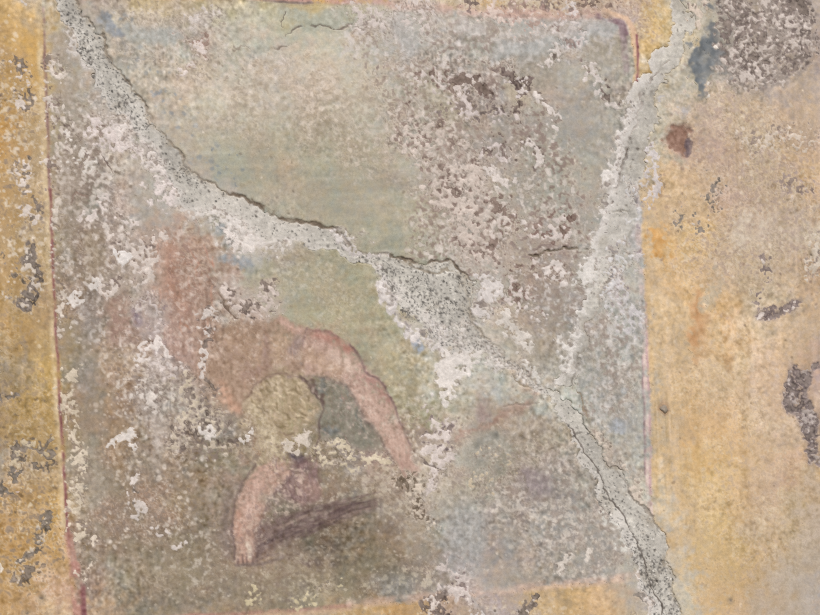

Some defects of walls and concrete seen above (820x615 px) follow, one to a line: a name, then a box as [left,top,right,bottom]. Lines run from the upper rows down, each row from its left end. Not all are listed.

peeling [0,19,305,462]
peeling [171,0,231,82]
crack [55,0,476,325]
peeling [279,0,820,548]
crack [617,0,696,212]
peeling [0,358,143,605]
crack [418,431,444,473]
peeling [417,547,542,615]
peeling [549,538,602,580]
crack [503,244,681,615]
peeling [593,506,655,615]